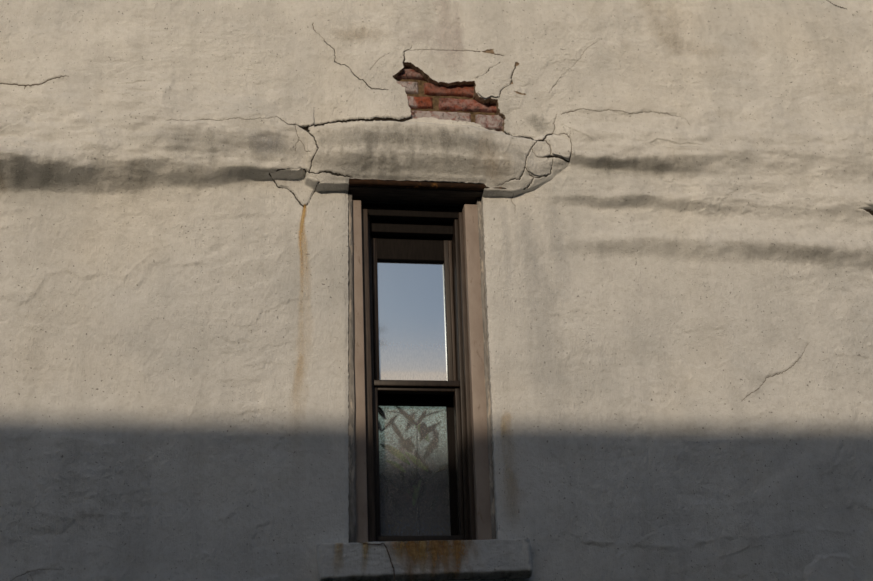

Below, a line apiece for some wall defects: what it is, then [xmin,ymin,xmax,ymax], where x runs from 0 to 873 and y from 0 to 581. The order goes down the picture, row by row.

crack [0,76,69,89]
crack [312,24,516,97]
spalling [393,49,526,132]
crack [170,116,412,208]
corrosion [392,540,466,571]